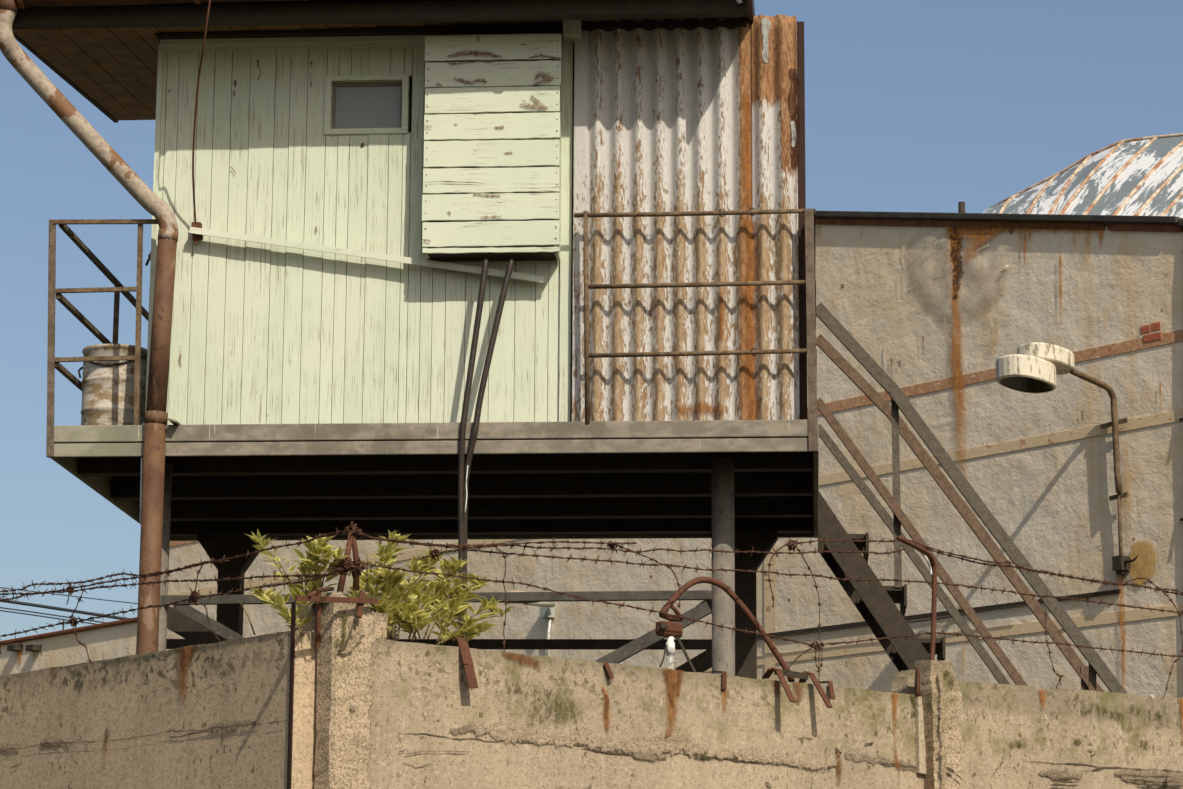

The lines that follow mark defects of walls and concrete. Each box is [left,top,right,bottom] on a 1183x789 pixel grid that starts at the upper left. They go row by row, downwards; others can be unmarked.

peeling [520,44,559,112]
rust [743,93,752,207]
rust [788,68,800,168]
rust [745,221,759,420]
rust [947,222,1103,450]
rust [679,403,724,414]
rust [179,646,196,693]
rust [664,669,684,736]
crack [0,720,287,768]
crack [399,732,634,768]
crack [662,735,784,764]